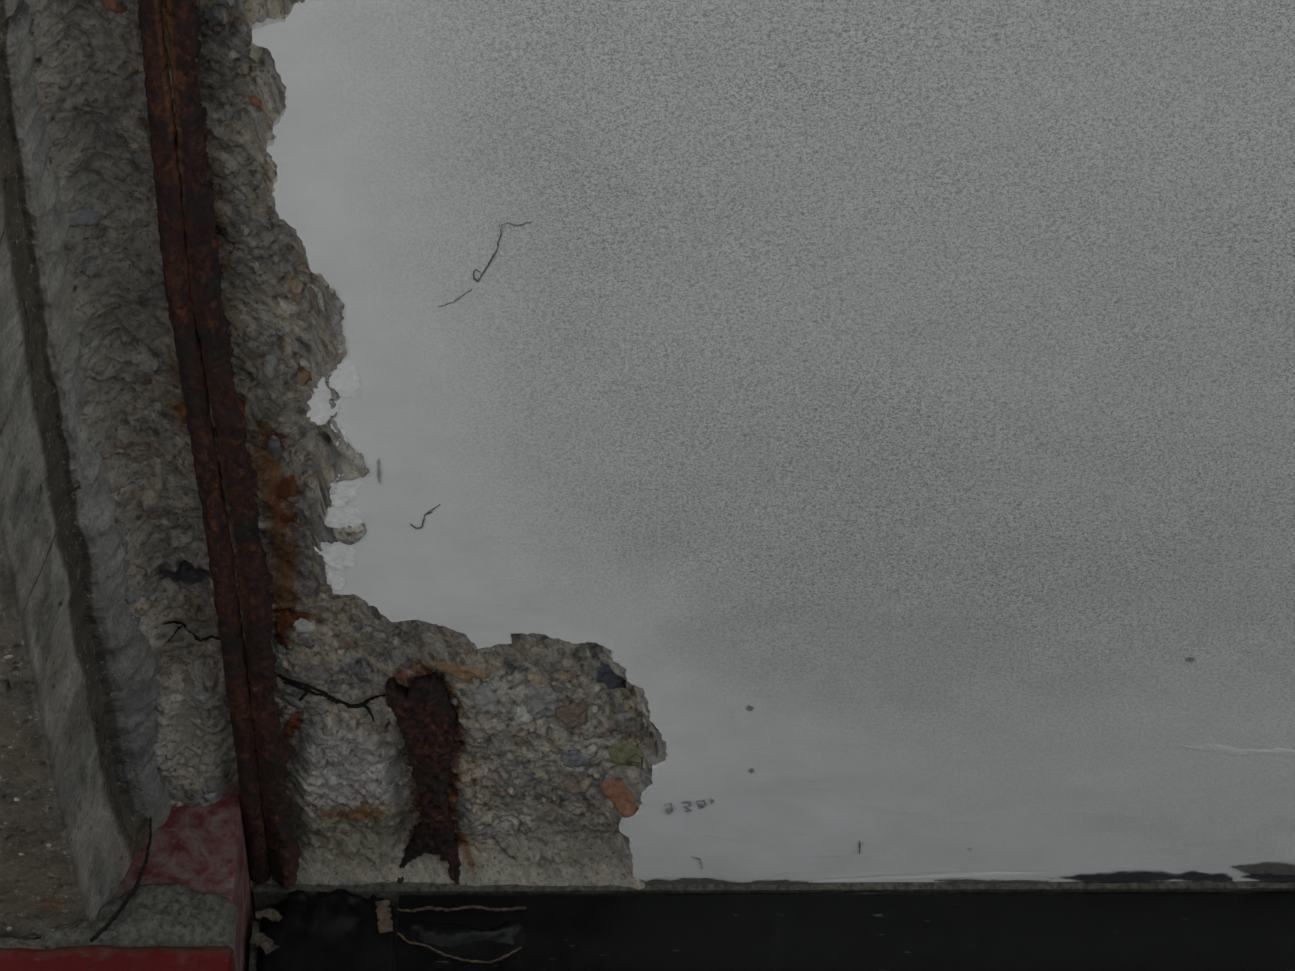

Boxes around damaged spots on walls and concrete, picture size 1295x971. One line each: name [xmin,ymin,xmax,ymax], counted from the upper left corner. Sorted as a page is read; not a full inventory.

spalling [24,0,238,807]
rust [138,0,311,890]
crack [277,674,385,722]
rust [385,663,473,885]
spalling [194,0,812,890]